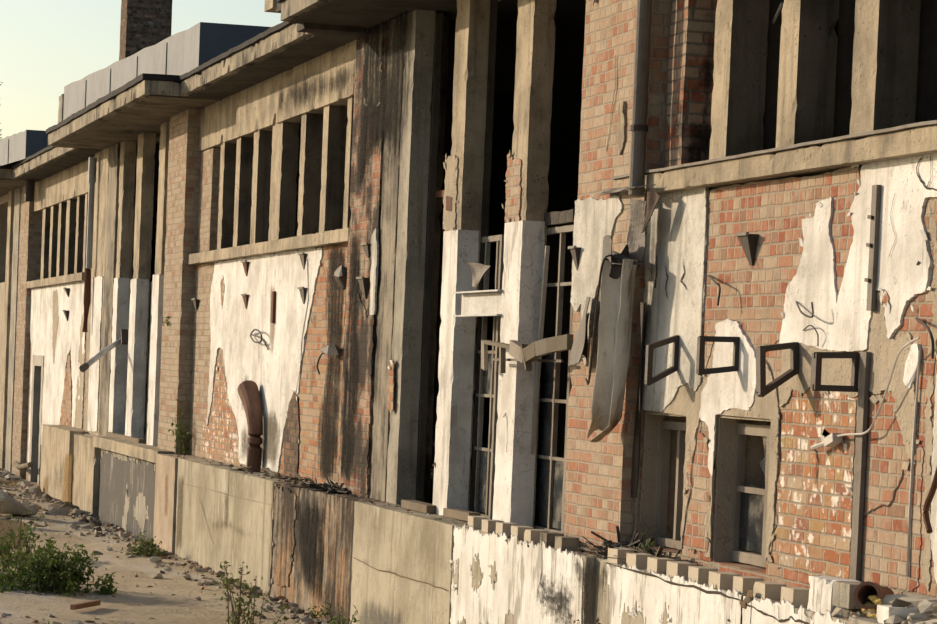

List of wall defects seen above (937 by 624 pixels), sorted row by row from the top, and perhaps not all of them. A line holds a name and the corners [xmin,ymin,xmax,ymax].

spalling [502,150,522,223]
spalling [704,165,861,369]
spalling [878,287,890,314]
spalling [911,201,937,404]
spalling [201,362,239,466]
crack [682,418,700,543]
crack [766,412,779,561]
crack [864,470,903,518]
peeling [449,553,497,597]
peeling [621,601,646,624]
peeling [659,602,672,624]
crack [606,562,814,624]